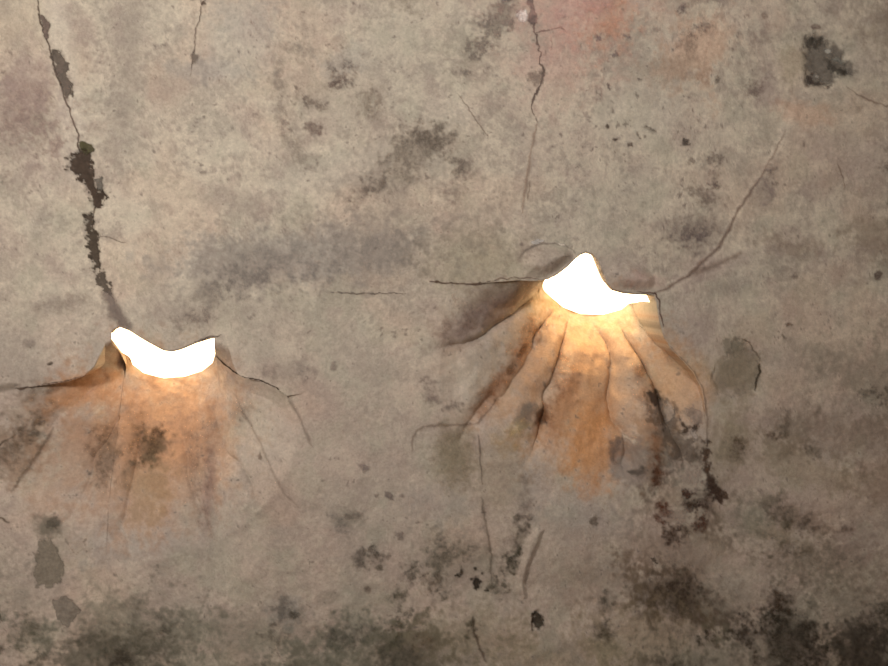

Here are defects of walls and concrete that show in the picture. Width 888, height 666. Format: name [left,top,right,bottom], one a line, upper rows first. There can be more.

crack [37,0,130,328]
crack [523,0,564,197]
spalling [804,37,853,87]
crack [640,208,739,326]